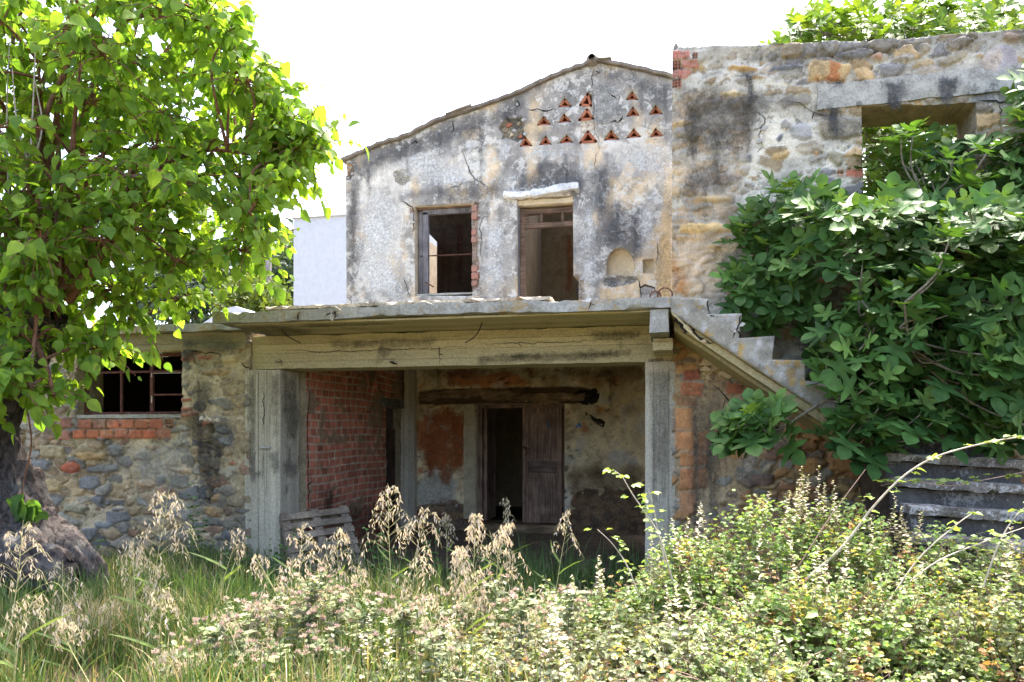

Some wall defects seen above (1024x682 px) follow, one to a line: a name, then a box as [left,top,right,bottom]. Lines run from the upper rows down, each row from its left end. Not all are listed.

crack [451,120,491,190]
spalling [497,115,527,162]
water stain [685,73,758,190]
crack [189,306,617,479]